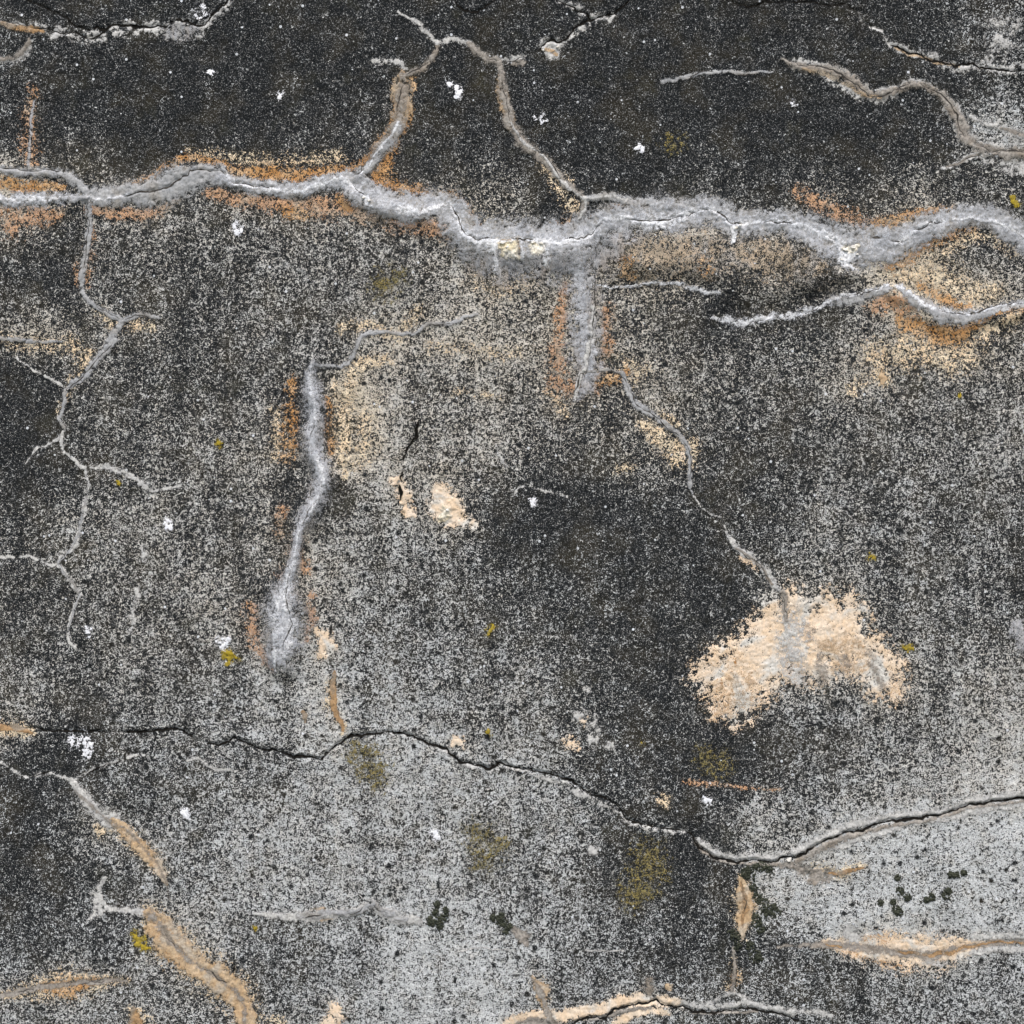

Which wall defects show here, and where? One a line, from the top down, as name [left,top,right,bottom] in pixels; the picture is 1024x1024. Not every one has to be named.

rust [83,199,180,223]
rust [128,76,473,214]
rust [201,185,449,246]
rust [791,182,955,228]
crack [0,0,1024,651]
rust [843,226,1024,397]
spalling [388,475,479,531]
spalling [680,578,915,735]
crack [0,727,1024,898]
crack [503,946,836,1024]